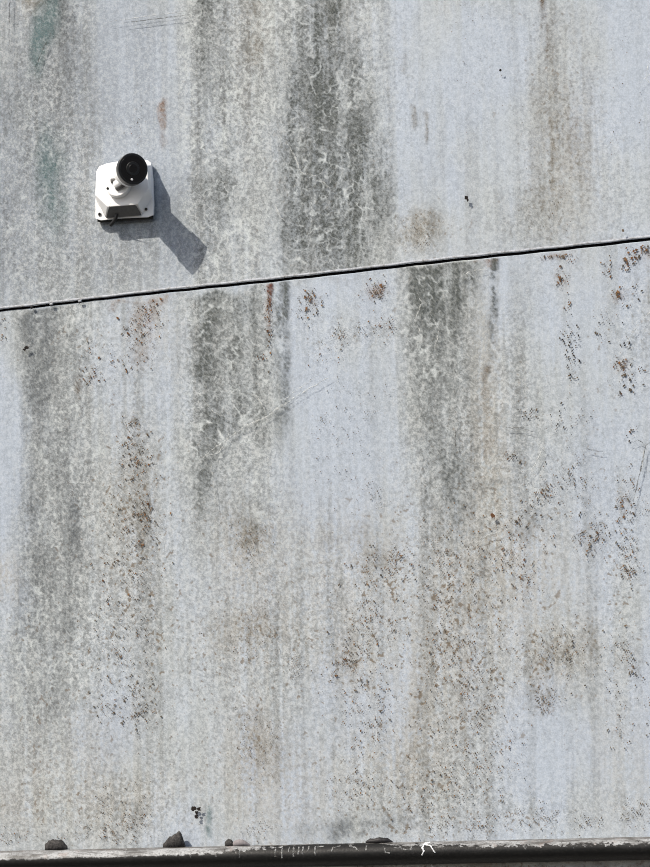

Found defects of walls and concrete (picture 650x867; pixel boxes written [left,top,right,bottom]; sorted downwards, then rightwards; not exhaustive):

corrosion [600,245,650,278]
corrosion [76,298,169,389]
corrosion [255,284,273,362]
corrosion [593,284,646,396]
corrosion [86,416,173,740]
corrosion [216,454,650,840]